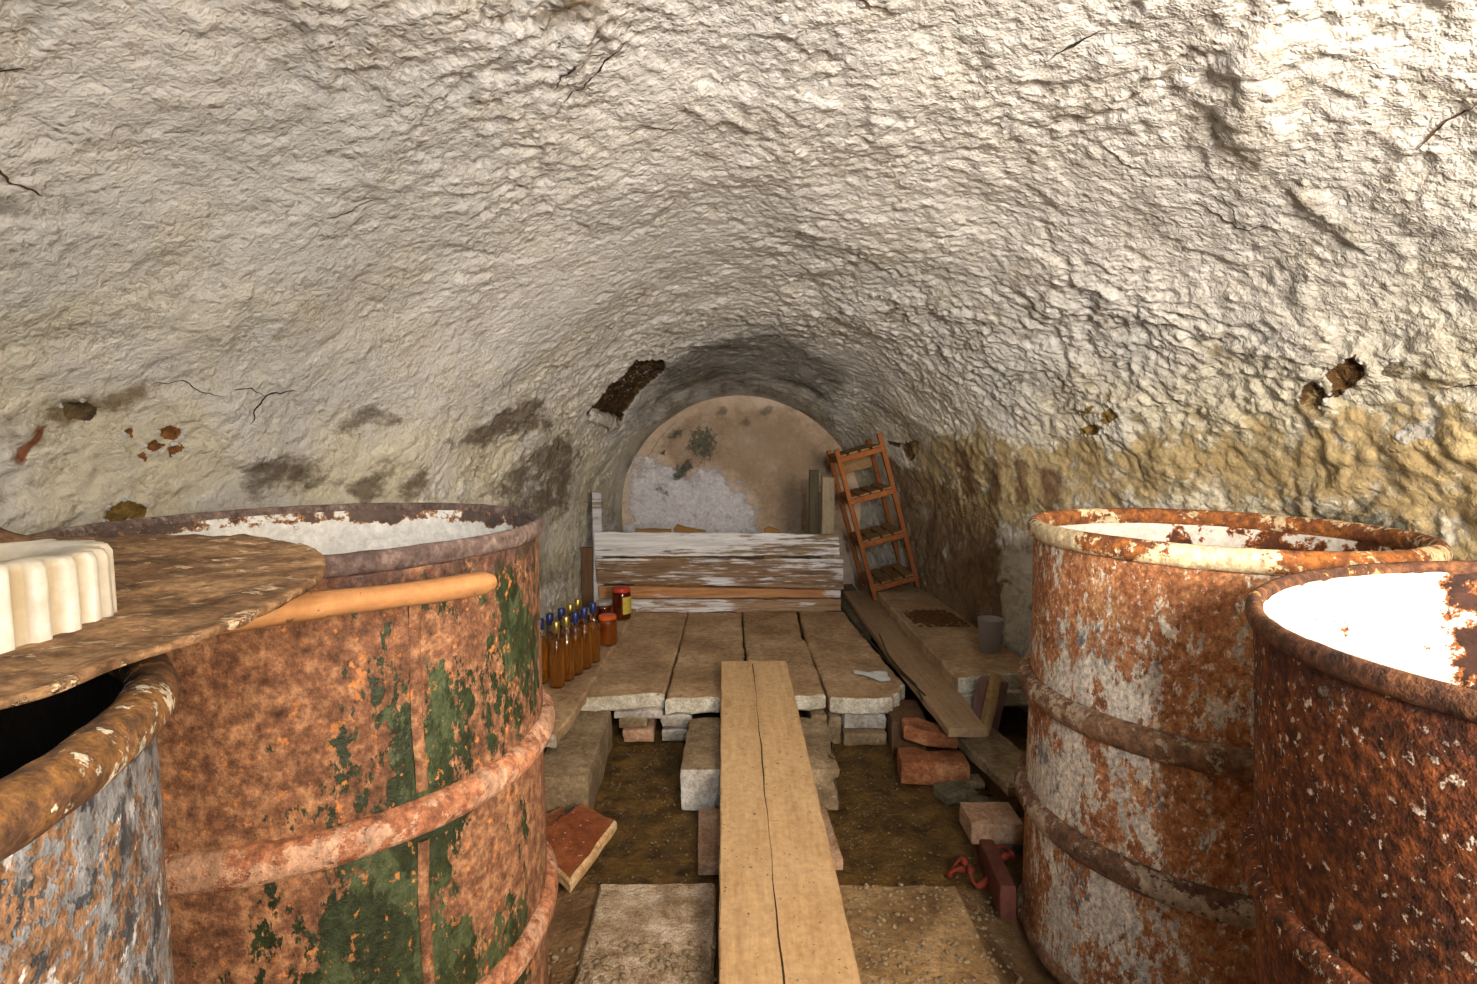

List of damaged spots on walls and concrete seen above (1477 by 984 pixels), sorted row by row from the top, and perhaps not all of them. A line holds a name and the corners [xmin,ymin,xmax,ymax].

spalling [1297,354,1364,410]
spalling [1381,358,1408,378]
water stain [342,407,400,432]
water stain [244,455,324,489]
water stain [347,472,383,503]
water stain [403,472,428,495]
water stain [462,400,579,521]
water stain [888,374,1477,628]